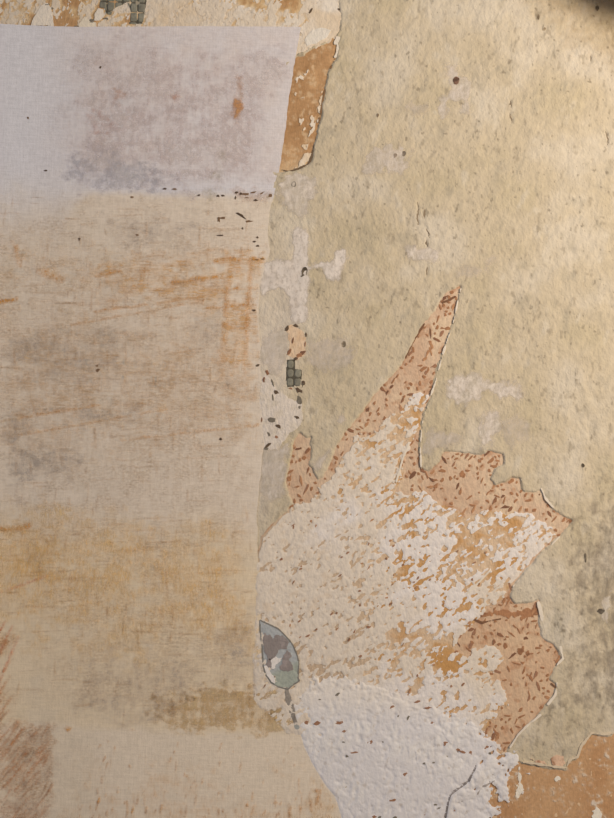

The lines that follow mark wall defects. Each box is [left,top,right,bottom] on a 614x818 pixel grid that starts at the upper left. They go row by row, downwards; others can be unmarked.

peeling [0,0,341,172]
peeling [252,286,614,818]